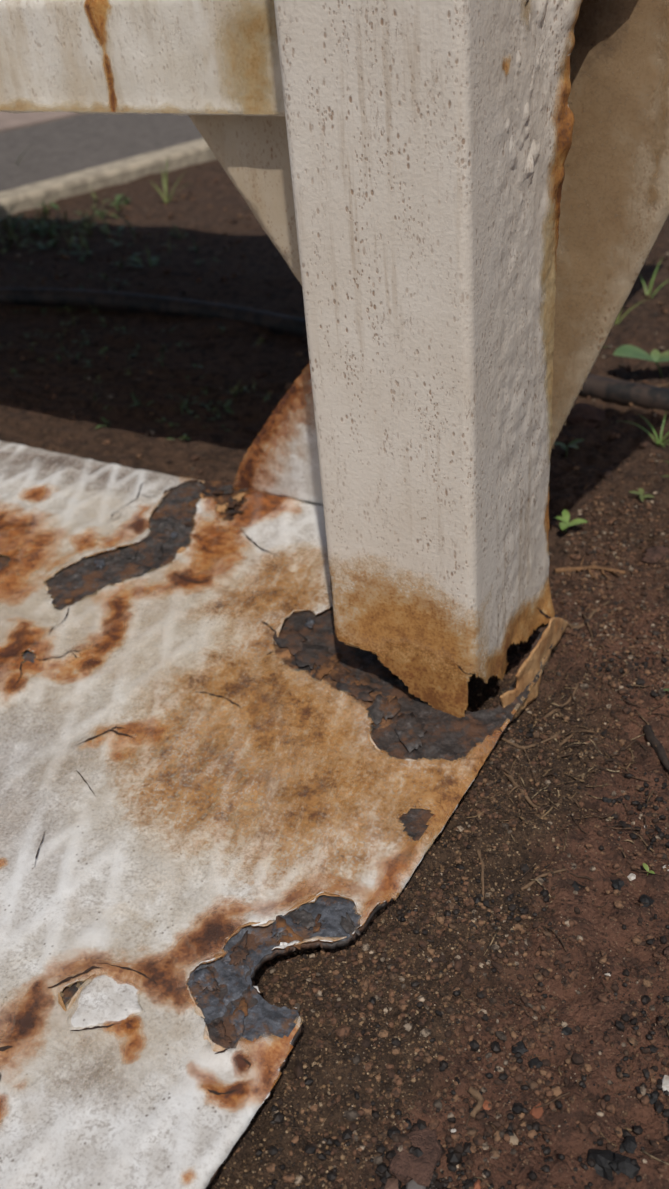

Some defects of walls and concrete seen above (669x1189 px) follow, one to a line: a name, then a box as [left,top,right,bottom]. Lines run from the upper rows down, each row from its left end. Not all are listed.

corrosion [0,0,182,113]
corrosion [541,0,583,458]
corrosion [0,362,569,1068]
spalling [273,605,563,763]